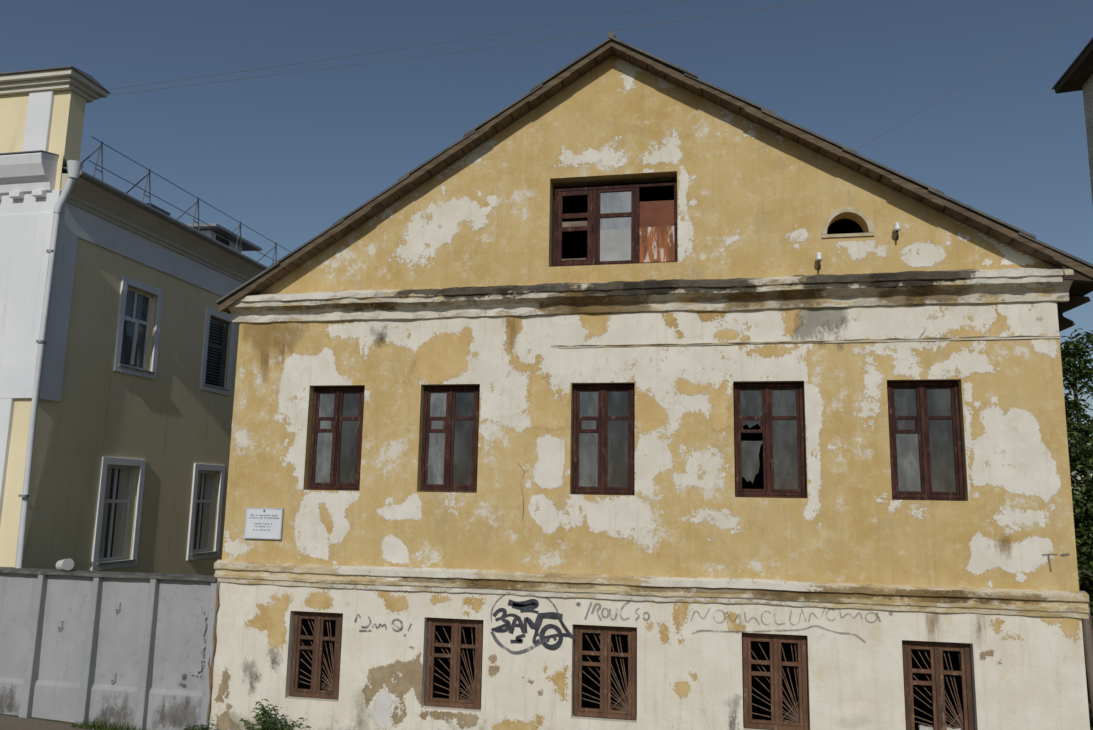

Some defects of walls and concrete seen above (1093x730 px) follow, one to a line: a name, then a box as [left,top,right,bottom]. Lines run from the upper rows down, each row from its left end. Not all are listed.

peeling [355,138,498,270]
peeling [553,129,697,262]
corrosion [640,226,675,263]
peeling [835,238,888,265]
peeling [901,217,1050,289]
water stain [286,302,395,311]
water stain [437,285,523,302]
water stain [540,279,680,315]
water stain [696,289,822,309]
peeling [241,290,1062,651]
spalling [362,646,479,730]
spalling [492,714,545,730]